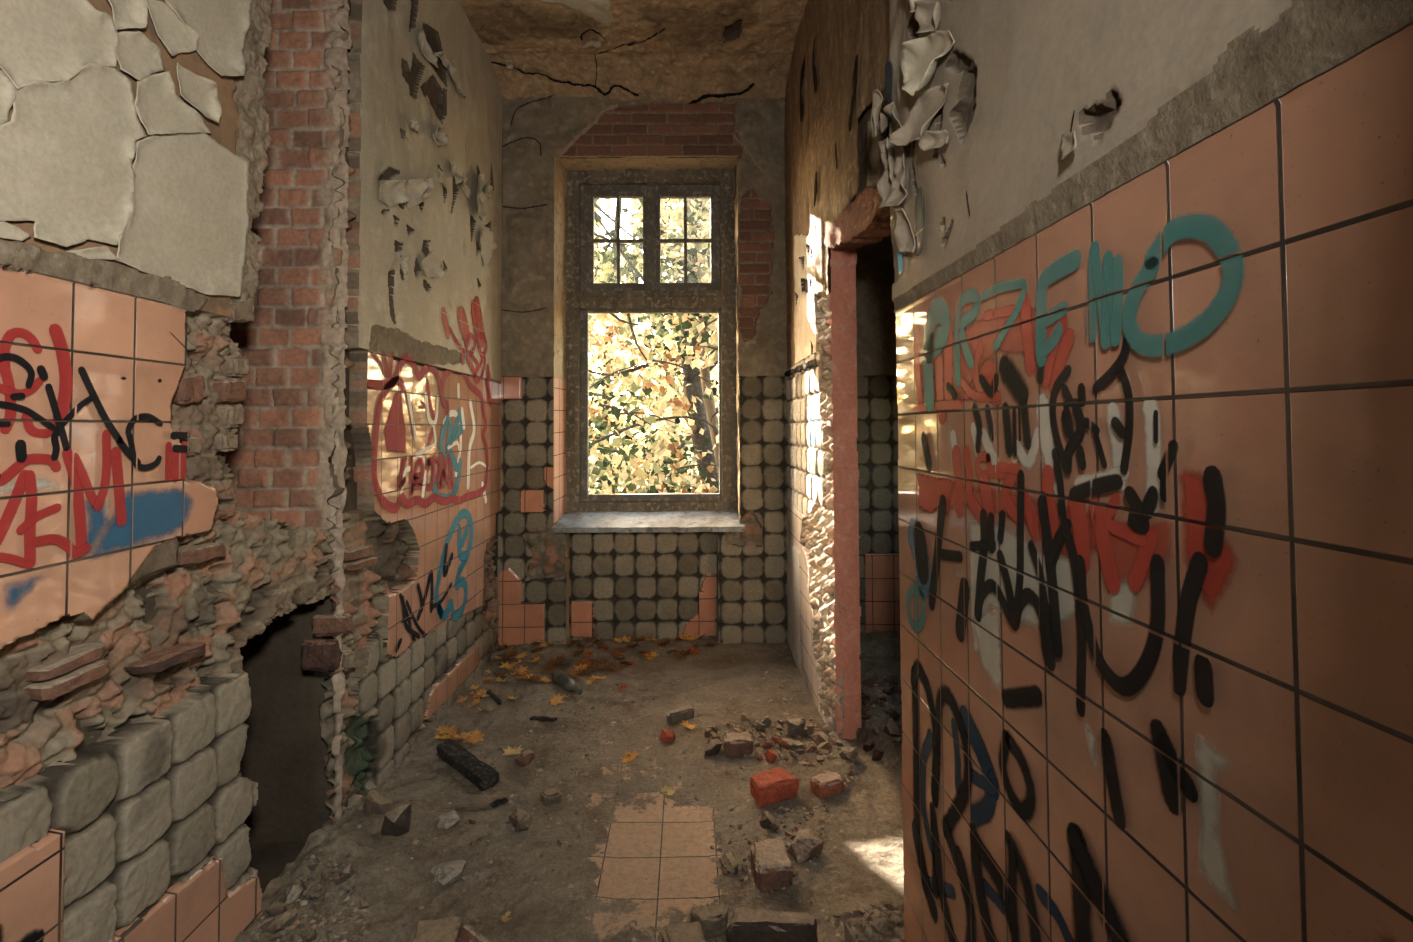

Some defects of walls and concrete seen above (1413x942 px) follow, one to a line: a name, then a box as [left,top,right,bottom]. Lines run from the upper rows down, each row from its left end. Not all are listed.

crack [491,28,665,156]
crack [688,83,754,104]
peeling [870,0,977,253]
peeling [1060,89,1122,162]
crack [502,202,547,210]
peeling [0,0,845,942]